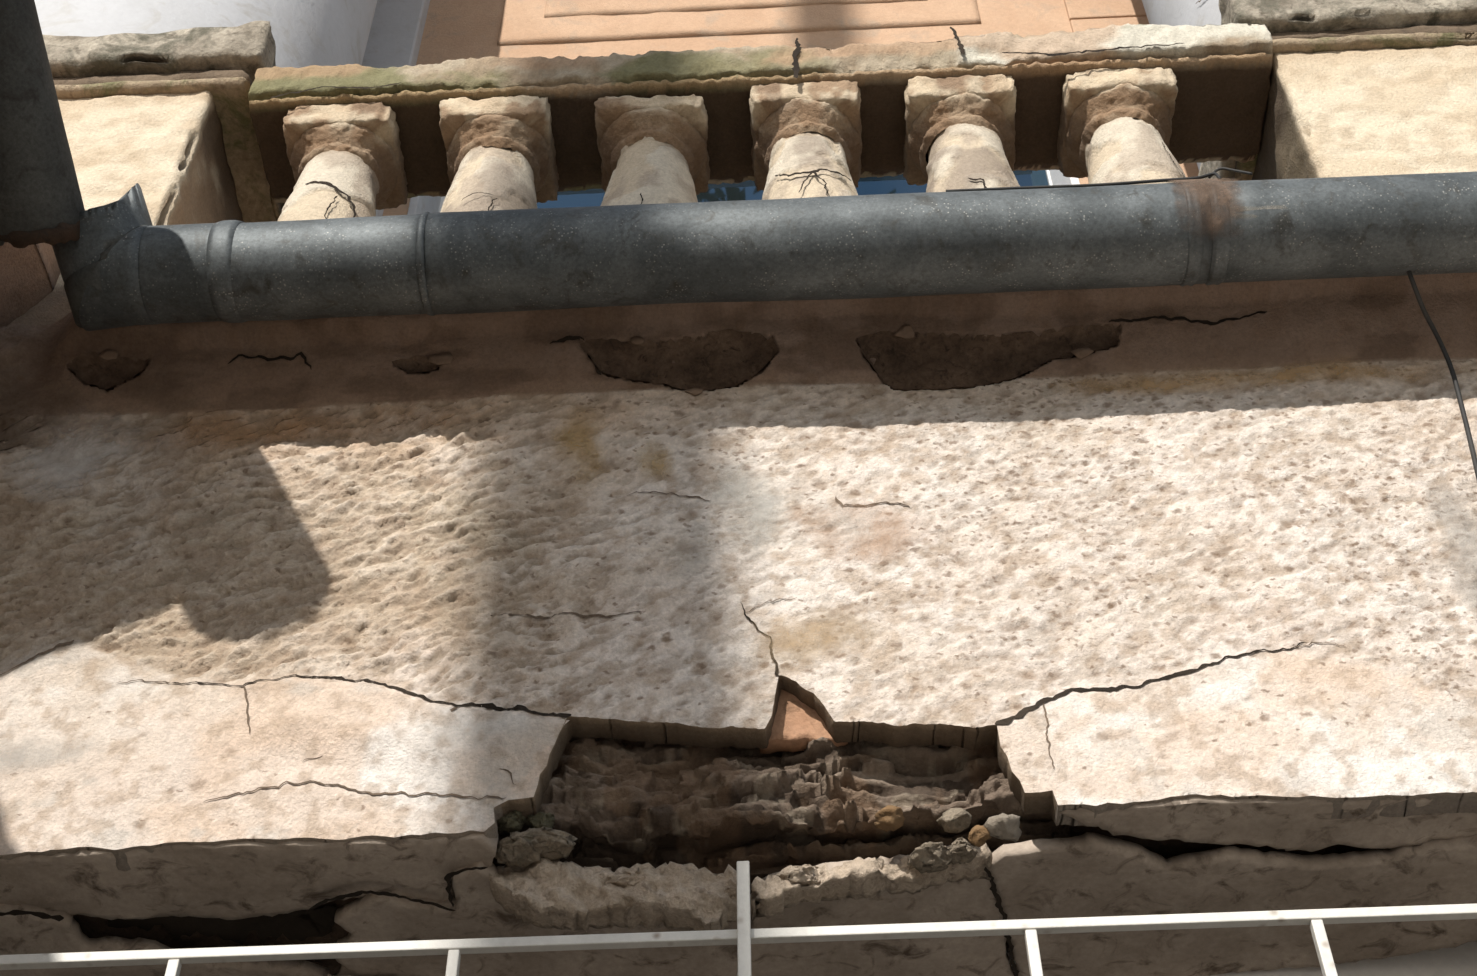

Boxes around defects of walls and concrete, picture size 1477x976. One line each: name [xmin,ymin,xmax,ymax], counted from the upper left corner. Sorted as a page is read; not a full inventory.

crack [306,181,356,219]
crack [775,168,851,196]
spalling [66,349,149,390]
spalling [579,329,778,396]
spalling [857,324,1121,391]
crack [0,640,74,675]
crack [741,597,797,676]
crack [122,674,571,733]
crack [995,642,1346,770]
crack [204,756,516,802]
spalling [489,690,1070,932]
crack [0,867,488,945]